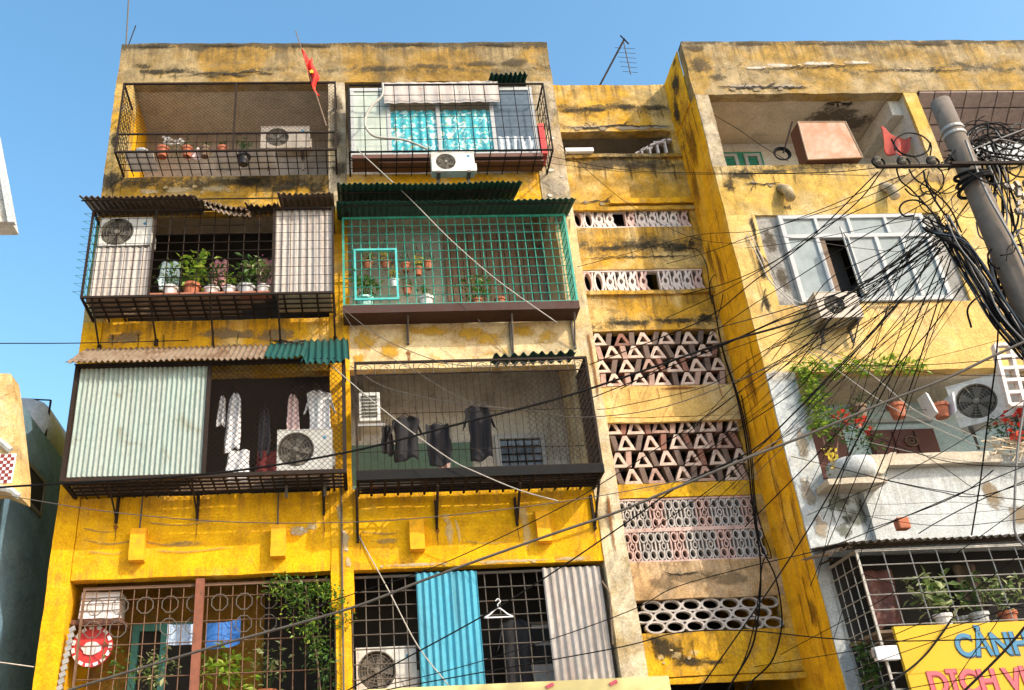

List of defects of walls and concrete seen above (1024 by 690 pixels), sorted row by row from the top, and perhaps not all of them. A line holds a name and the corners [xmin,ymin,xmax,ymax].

leakage [136,64,188,78]
leakage [459,43,528,66]
flaking render [747,61,872,70]
leakage [560,61,699,198]
leakage [805,106,872,132]
mould [106,172,118,197]
leakage [231,177,325,203]
leakage [649,637,726,666]